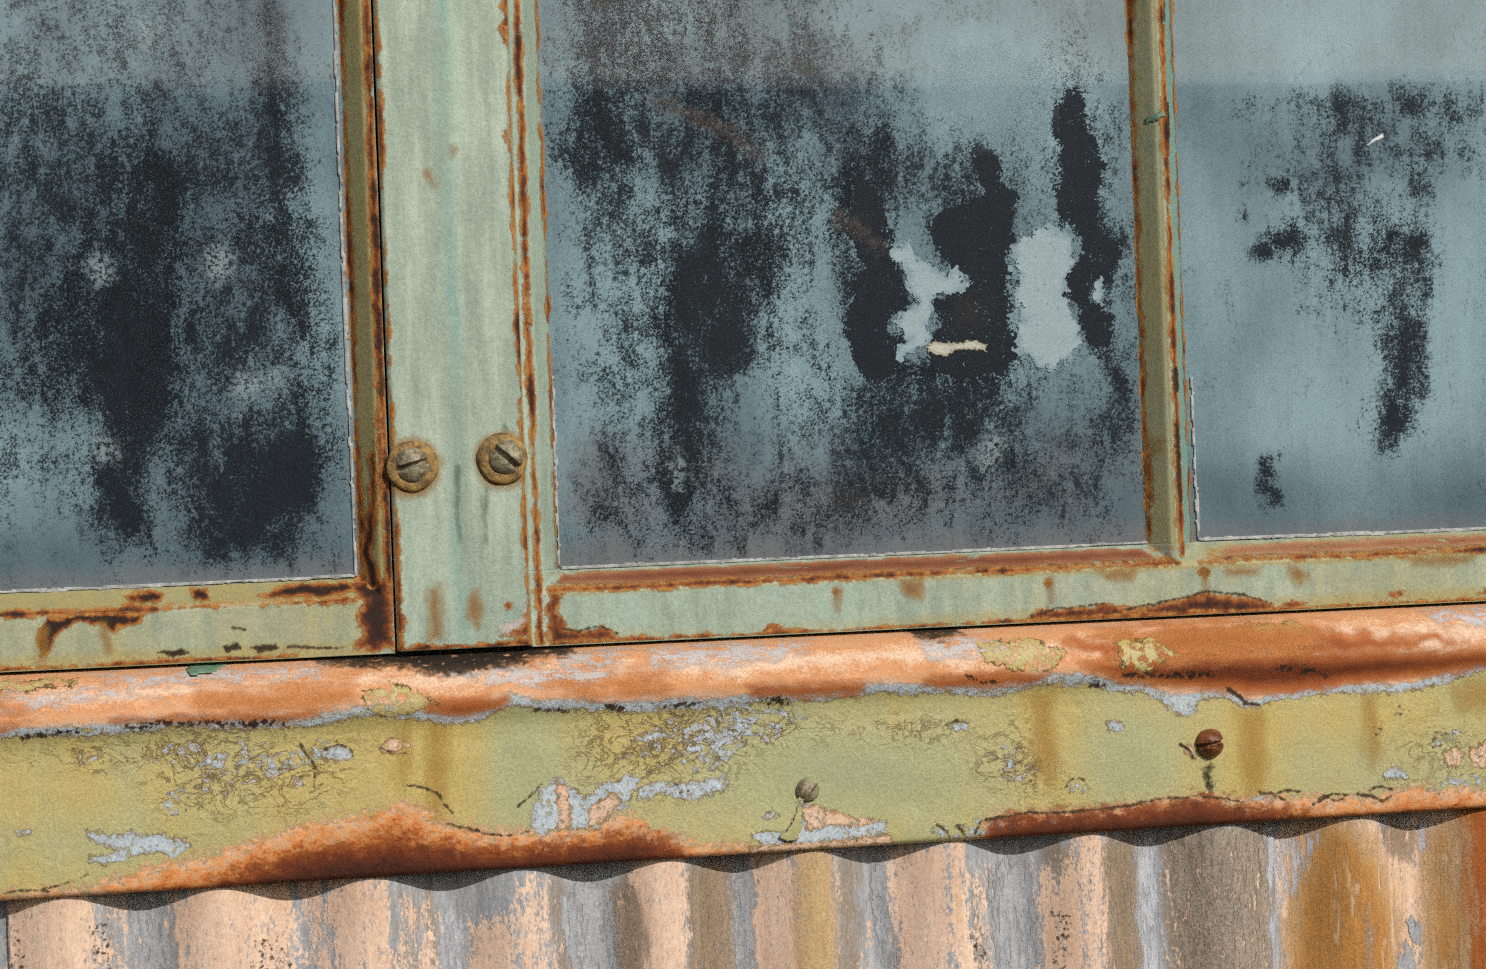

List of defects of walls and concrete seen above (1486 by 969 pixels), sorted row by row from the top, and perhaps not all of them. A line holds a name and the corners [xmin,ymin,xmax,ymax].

damp [0,0,351,581]
rust [0,0,1486,671]
damp [542,0,1140,559]
damp [1228,75,1484,459]
damp [1254,453,1285,508]
peeling [0,603,1486,839]
peeling [86,788,192,867]
rust [0,797,837,969]
peeling [566,880,622,969]
peeling [732,800,894,969]
peeling [986,852,1043,969]
rust [974,782,1486,969]